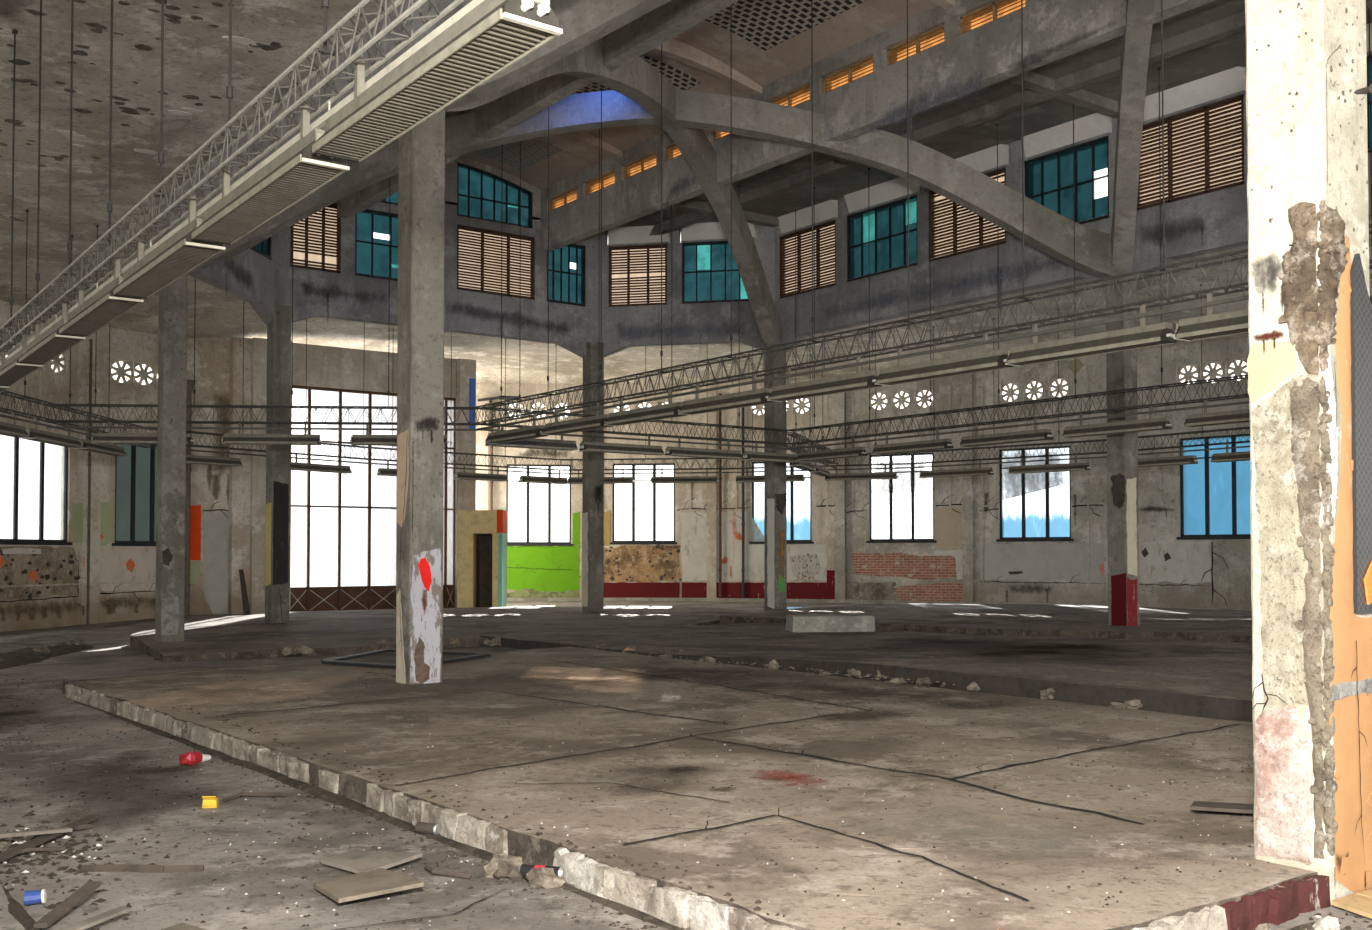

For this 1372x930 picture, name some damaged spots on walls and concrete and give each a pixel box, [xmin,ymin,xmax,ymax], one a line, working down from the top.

peeling [1110,473,1213,584]
peeling [1252,183,1372,894]
peeling [396,548,441,684]